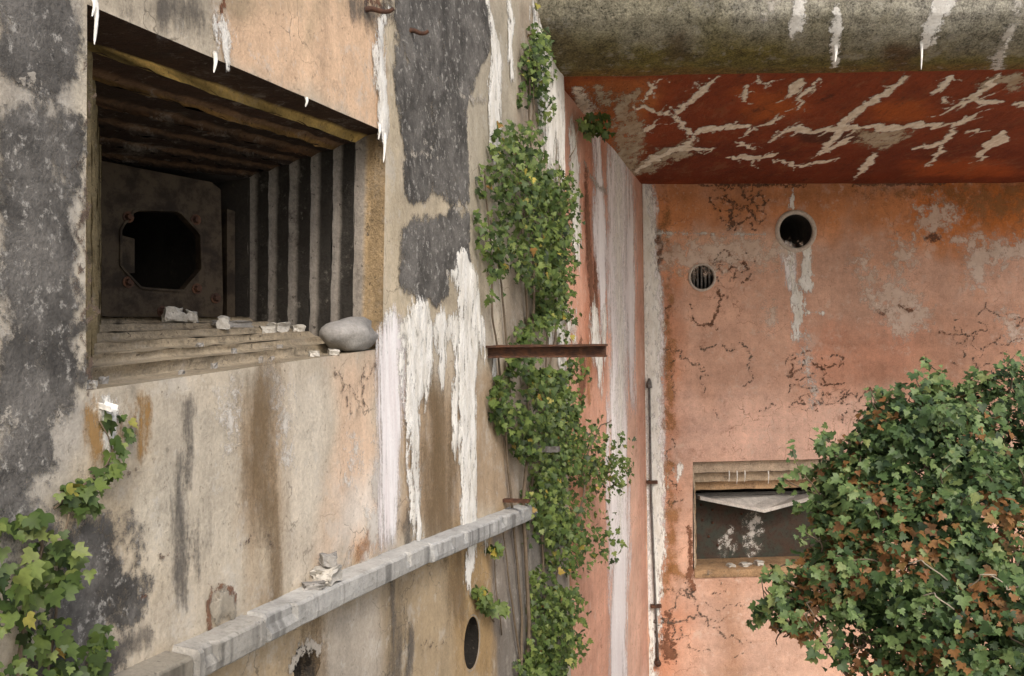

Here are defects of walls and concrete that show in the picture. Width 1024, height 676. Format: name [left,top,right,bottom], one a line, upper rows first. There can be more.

leakage [829,3,844,68]
leakage [919,0,956,49]
leakage [988,0,1022,71]
crack [654,237,664,270]
leakage [529,0,824,676]
crack [665,186,770,419]
crack [938,302,1024,369]
rust [137,397,152,458]
leakage [344,247,497,562]
crack [759,350,867,442]
leakage [172,400,199,603]
crack [653,582,752,662]